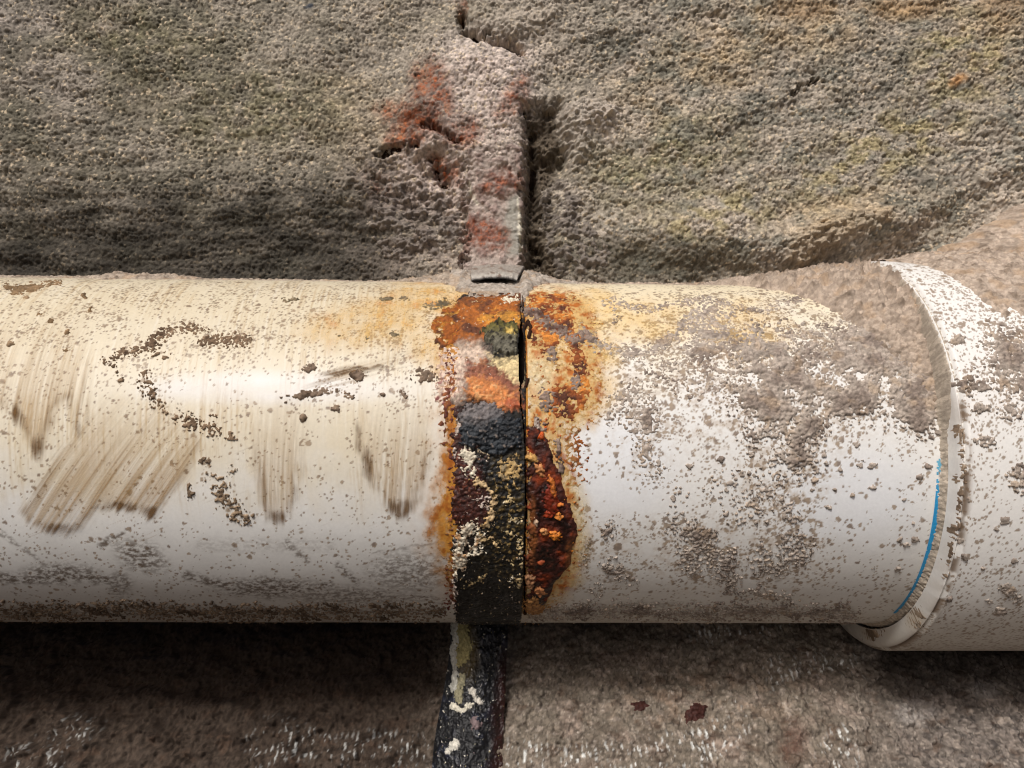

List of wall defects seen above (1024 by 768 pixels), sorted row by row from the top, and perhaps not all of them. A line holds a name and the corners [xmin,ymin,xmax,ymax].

rust [413,289,461,616]
rust [521,288,605,625]